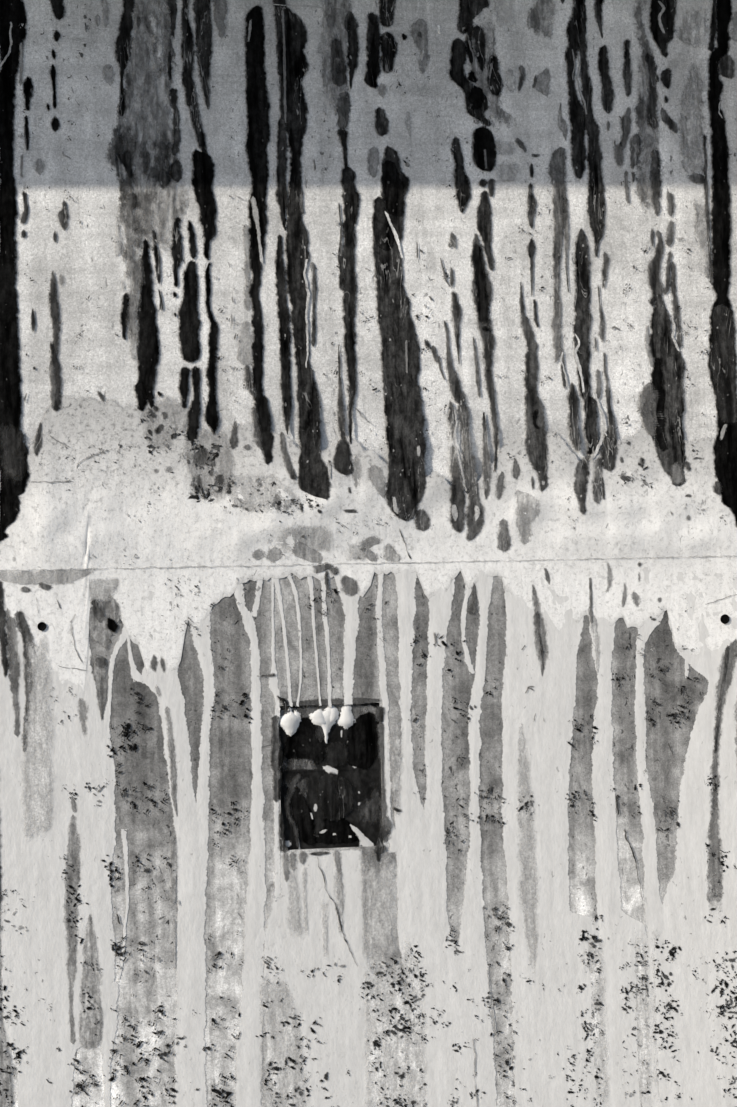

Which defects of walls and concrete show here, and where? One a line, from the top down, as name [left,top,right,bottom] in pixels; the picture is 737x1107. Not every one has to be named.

leakage [0,0,34,436]
leakage [174,220,201,363]
leakage [181,0,217,260]
leakage [275,235,292,434]
leakage [347,0,440,136]
leakage [476,190,494,271]
leakage [449,0,539,228]
leakage [548,147,582,451]
leakage [558,0,606,257]
leakage [573,229,599,456]
leakage [283,712,380,774]
crack [318,864,357,965]